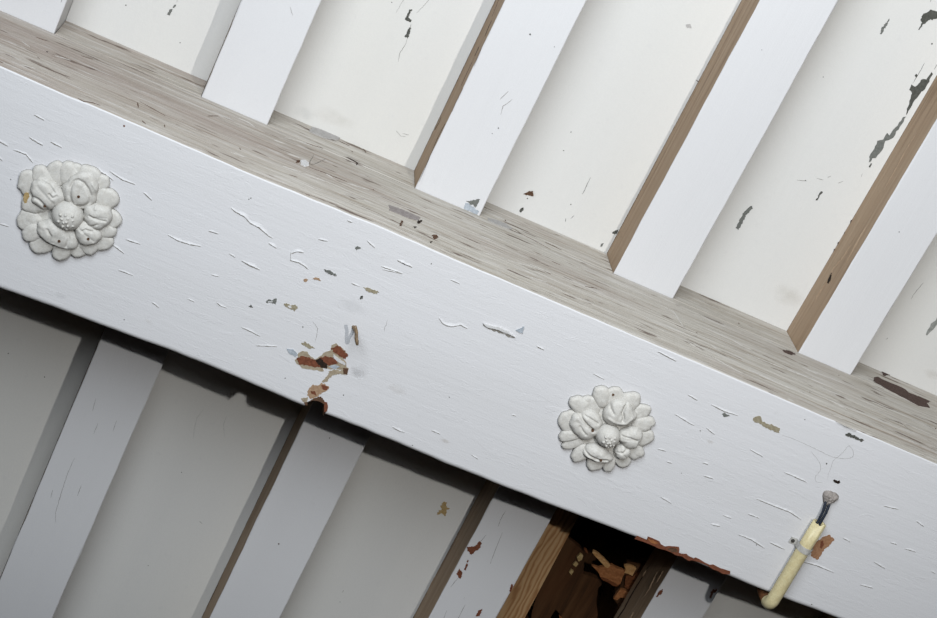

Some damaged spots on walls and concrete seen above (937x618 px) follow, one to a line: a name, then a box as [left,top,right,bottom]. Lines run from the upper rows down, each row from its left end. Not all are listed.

peeling [918,10,937,30]
peeling [869,72,933,167]
peeling [287,341,349,415]
peeling [753,416,780,433]
peeling [456,541,482,579]
spalling [635,536,730,574]